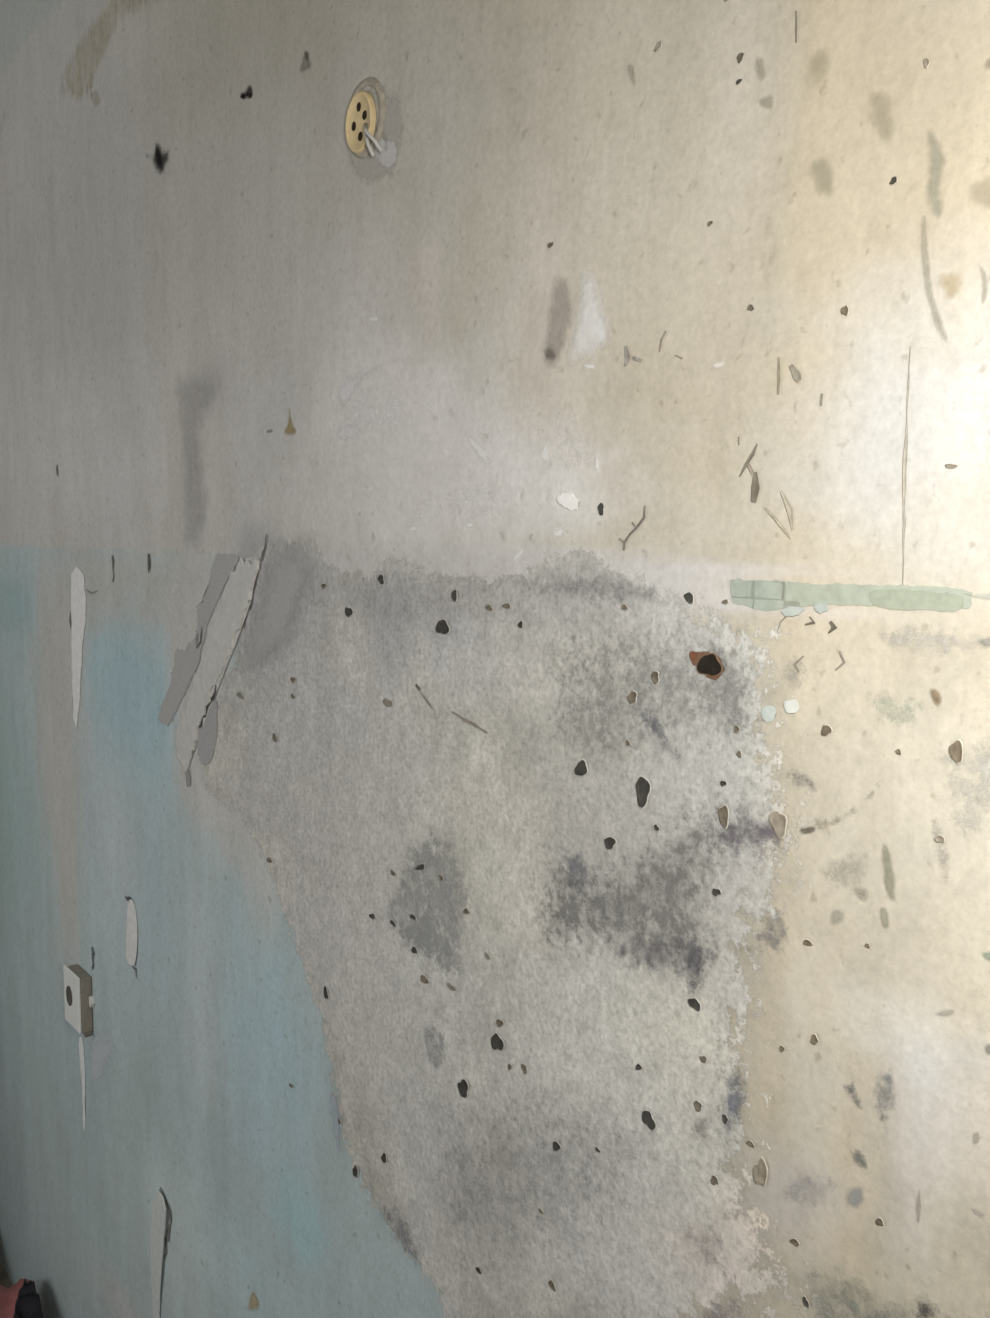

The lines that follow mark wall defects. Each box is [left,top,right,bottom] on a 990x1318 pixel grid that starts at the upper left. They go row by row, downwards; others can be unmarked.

peeling [557,493,580,511]
peeling [69,566,97,729]
peeling [125,896,137,979]
damp [390,842,467,971]
spalling [158,528,841,1318]
damp [542,820,779,988]
flaking render [150,1187,172,1318]